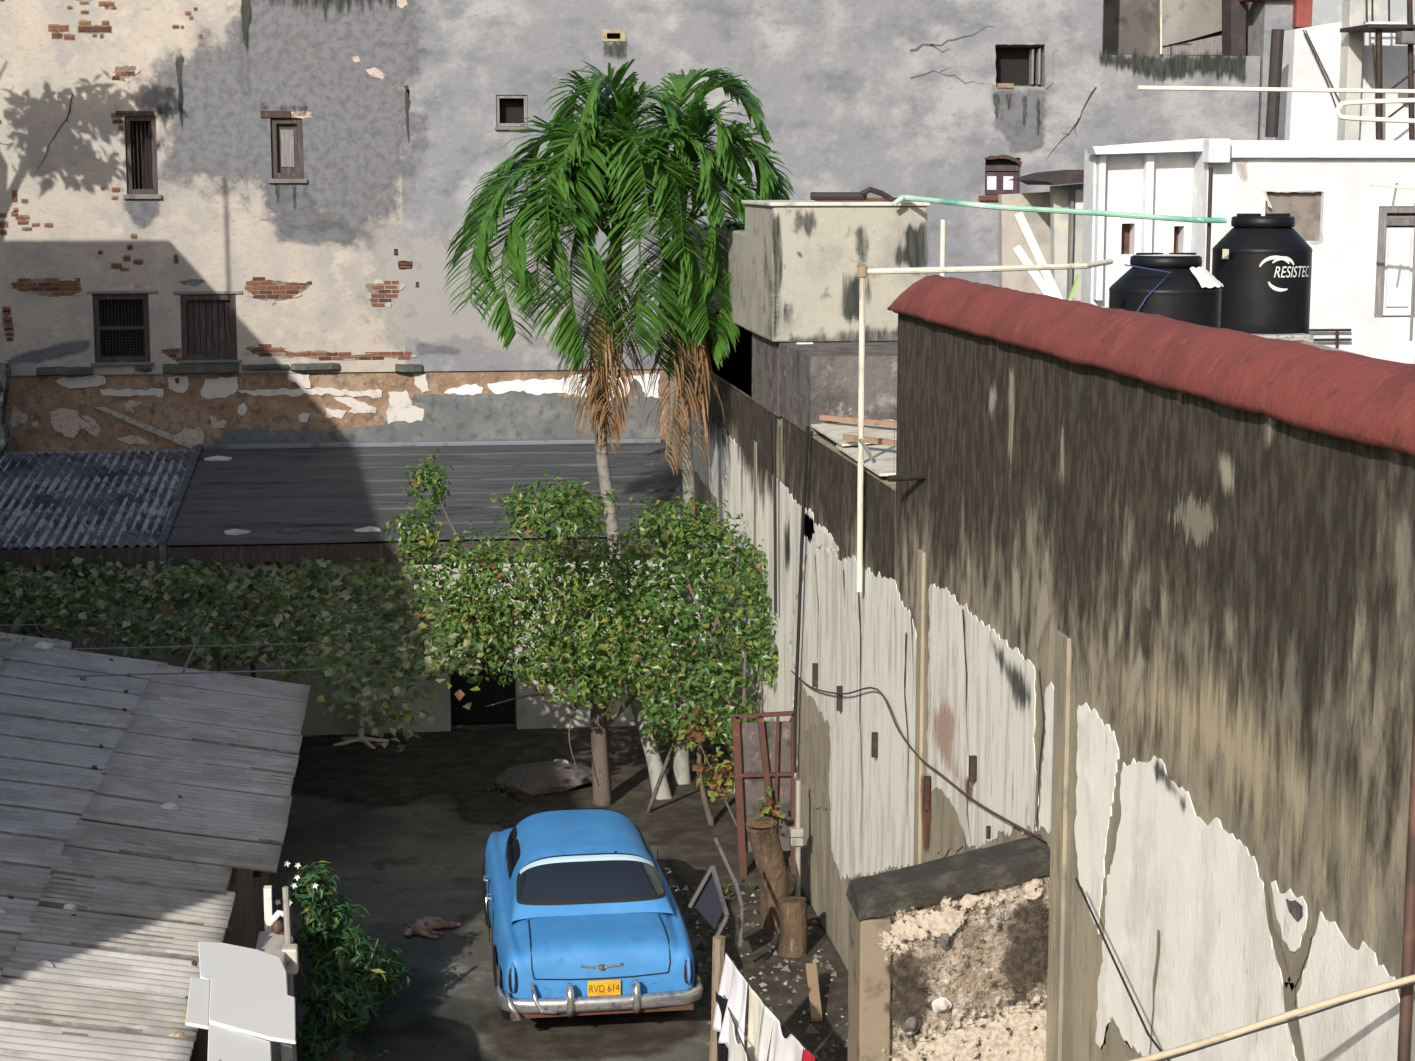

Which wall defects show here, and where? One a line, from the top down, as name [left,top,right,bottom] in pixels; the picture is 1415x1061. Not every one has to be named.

flaking render [48,0,117,41]
crack [910,26,993,84]
damp [1100,50,1246,81]
crack [36,95,73,173]
damp [125,199,159,227]
damp [137,0,581,354]
flaking render [245,277,312,305]
flaking render [55,344,588,447]
flaking render [608,373,660,401]
damp [669,213,1415,870]
peeling [690,408,1054,881]
peeling [1074,703,1400,1061]